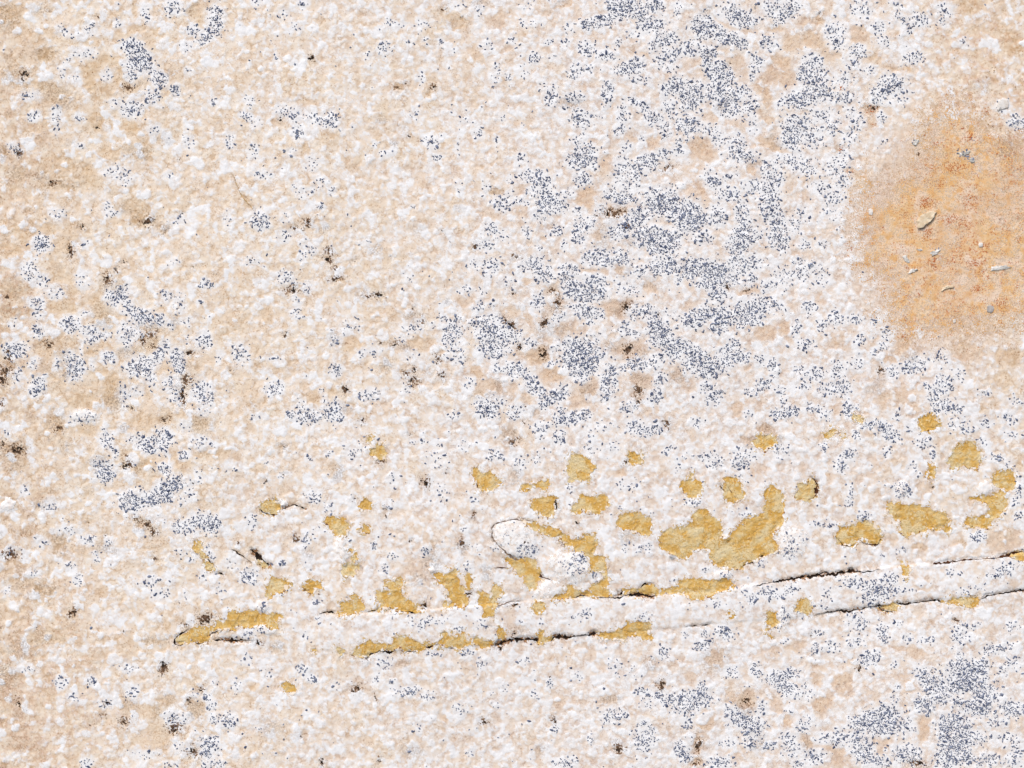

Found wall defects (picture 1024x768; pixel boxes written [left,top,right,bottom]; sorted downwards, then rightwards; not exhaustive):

rust [831,86,1024,359]
spalling [923,438,986,484]
spalling [833,466,1017,549]
spalling [505,449,821,617]
crack [196,549,271,575]
crack [743,536,881,586]
spalling [171,555,324,650]
spalling [331,565,509,660]
crack [495,631,597,651]
crack [572,583,656,599]
spalling [595,620,654,644]
crack [819,598,958,621]